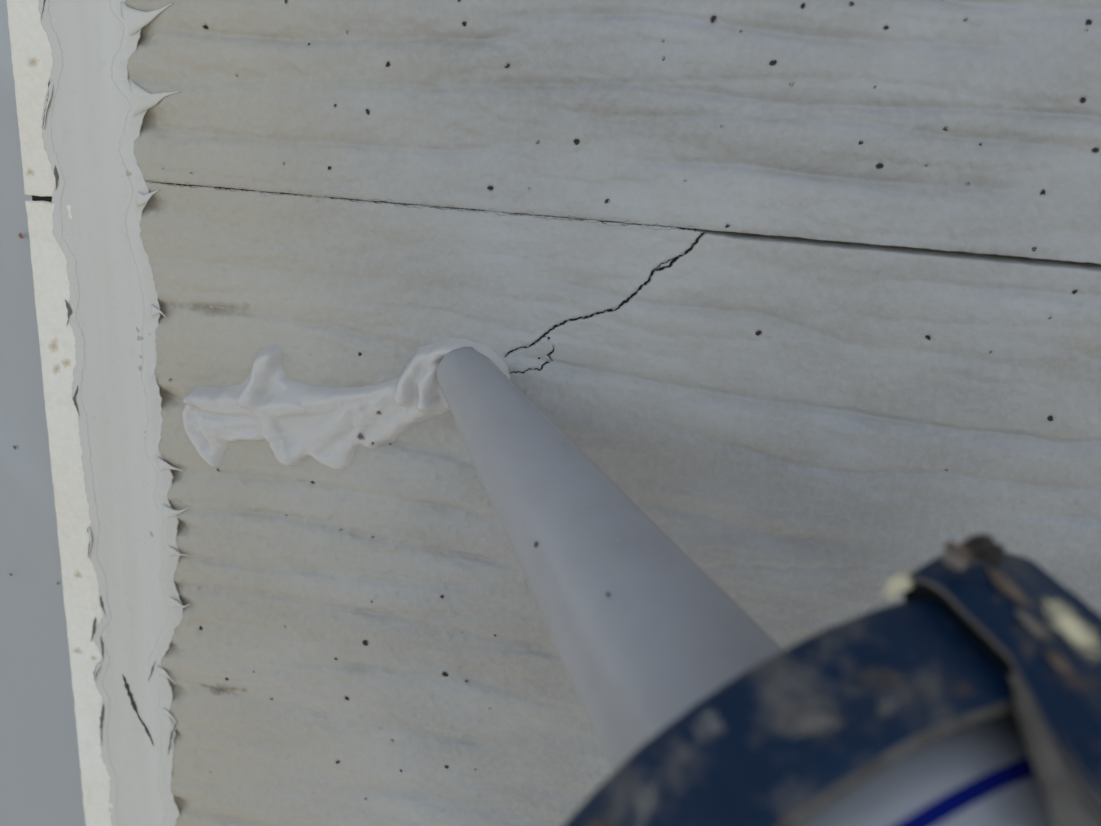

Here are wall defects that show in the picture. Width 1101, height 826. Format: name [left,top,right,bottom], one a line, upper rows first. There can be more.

crack [149,180,706,373]